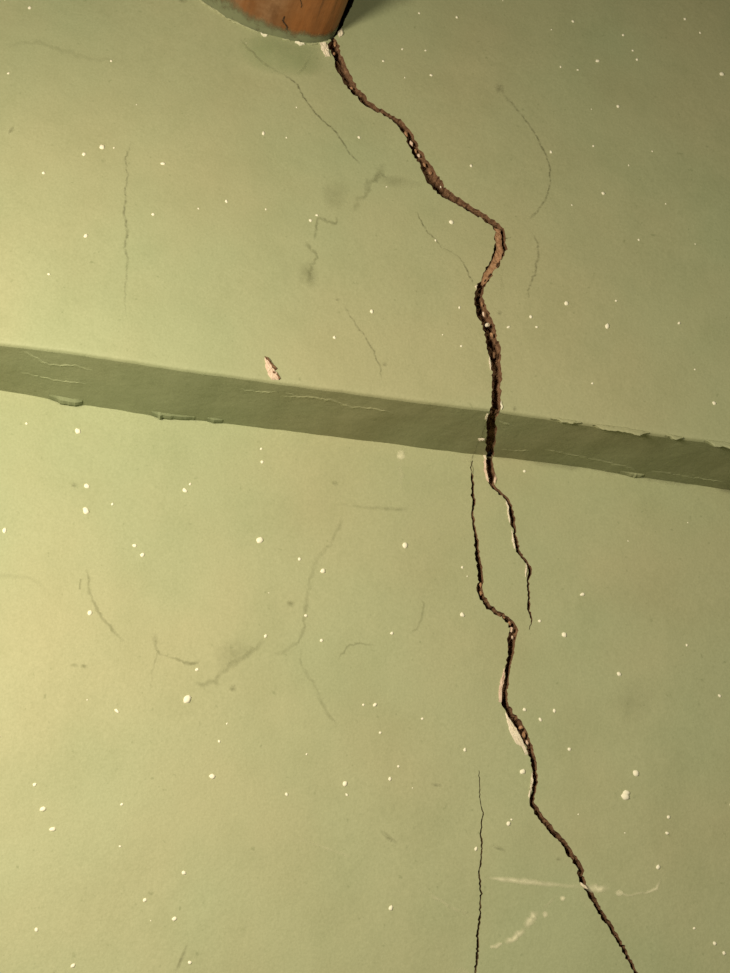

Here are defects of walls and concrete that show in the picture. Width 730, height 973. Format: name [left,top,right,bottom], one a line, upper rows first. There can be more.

spalling [265,356,281,380]
crack [328,38,638,973]